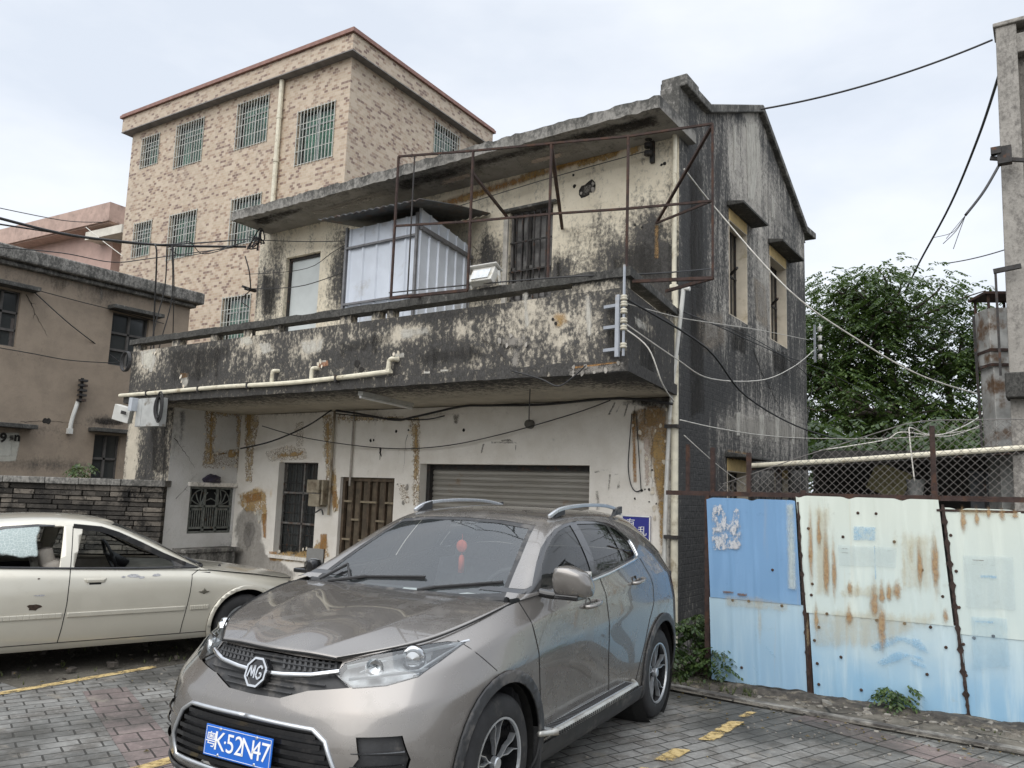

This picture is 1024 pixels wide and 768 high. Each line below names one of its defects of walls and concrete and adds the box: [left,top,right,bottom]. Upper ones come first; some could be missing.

damp [443,151,617,204]
damp [733,122,788,227]
damp [302,341,322,353]
peeling [202,411,259,483]
damp [726,412,802,444]
peeling [631,407,670,554]
peeling [712,504,741,550]
corrosion [961,509,1018,529]
corrosion [809,519,852,593]
corrosion [918,545,939,583]
corrosion [871,585,900,644]